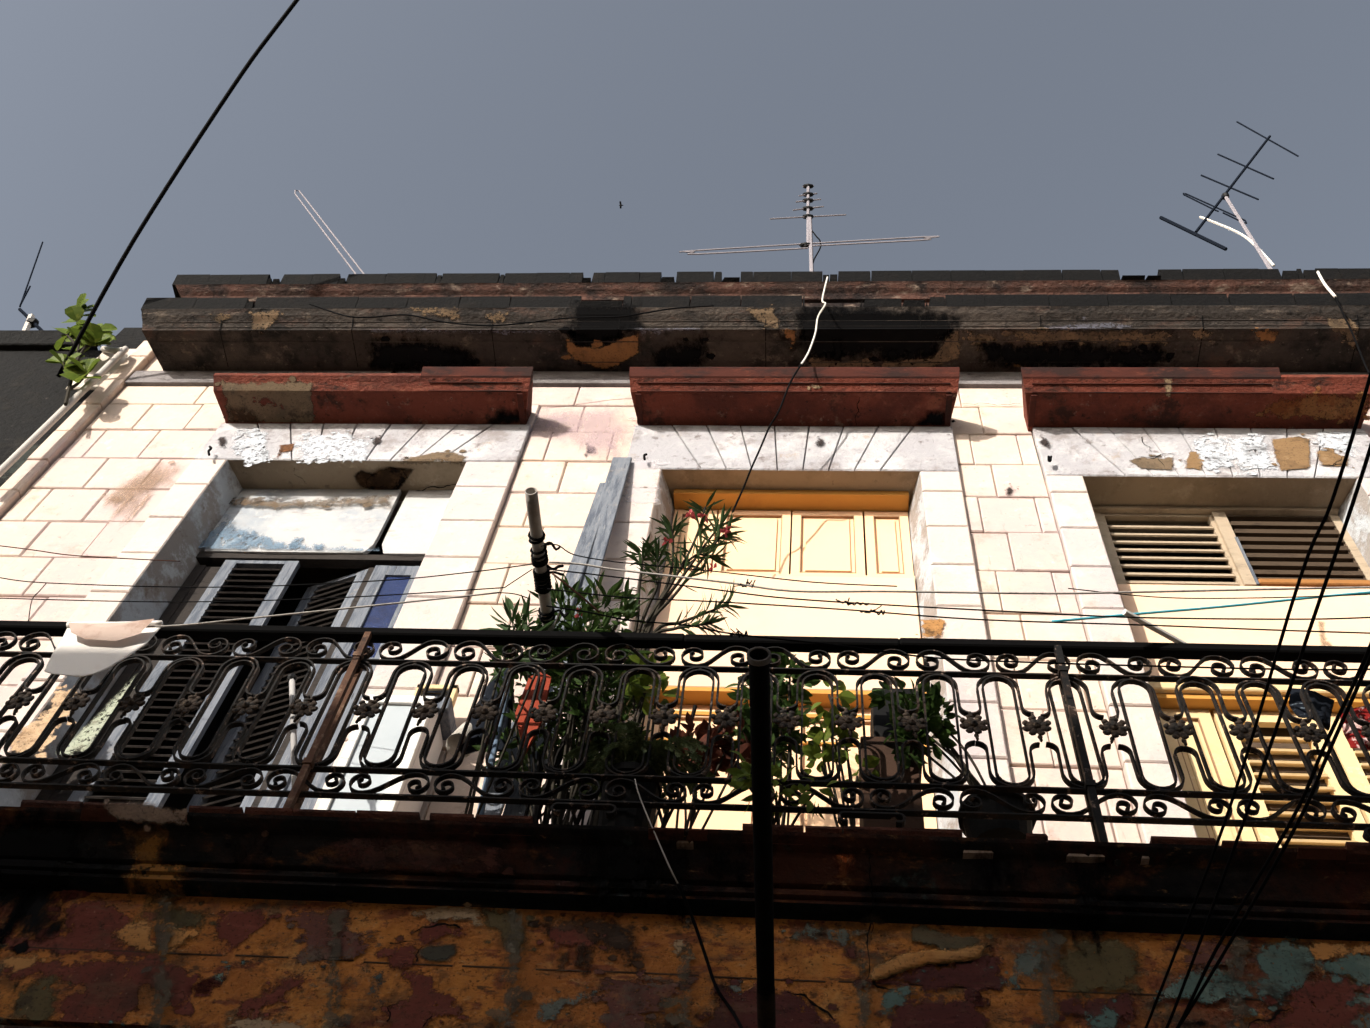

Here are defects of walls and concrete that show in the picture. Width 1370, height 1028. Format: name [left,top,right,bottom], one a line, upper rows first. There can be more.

water stain [368,300,716,373]
flaking render [561,334,639,370]
water stain [794,305,960,367]
water stain [977,317,1174,367]
flaking render [214,375,466,509]
peeling [1129,385,1370,475]
water stain [0,809,97,955]
water stain [318,834,514,878]
peeling [0,899,483,1028]
peeling [665,978,758,1028]
peeling [853,924,1021,1028]
flaking render [1304,942,1370,983]